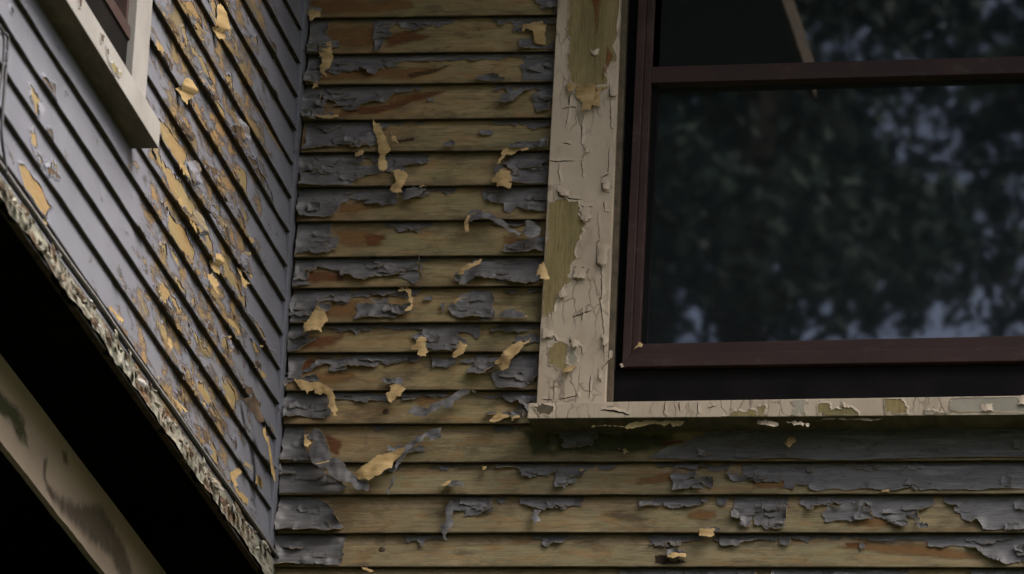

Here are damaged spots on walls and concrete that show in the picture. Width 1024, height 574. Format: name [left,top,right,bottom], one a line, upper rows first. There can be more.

peeling [0,0,619,565]
crack [542,68,630,415]
crack [663,402,716,416]
peeling [402,395,1024,574]